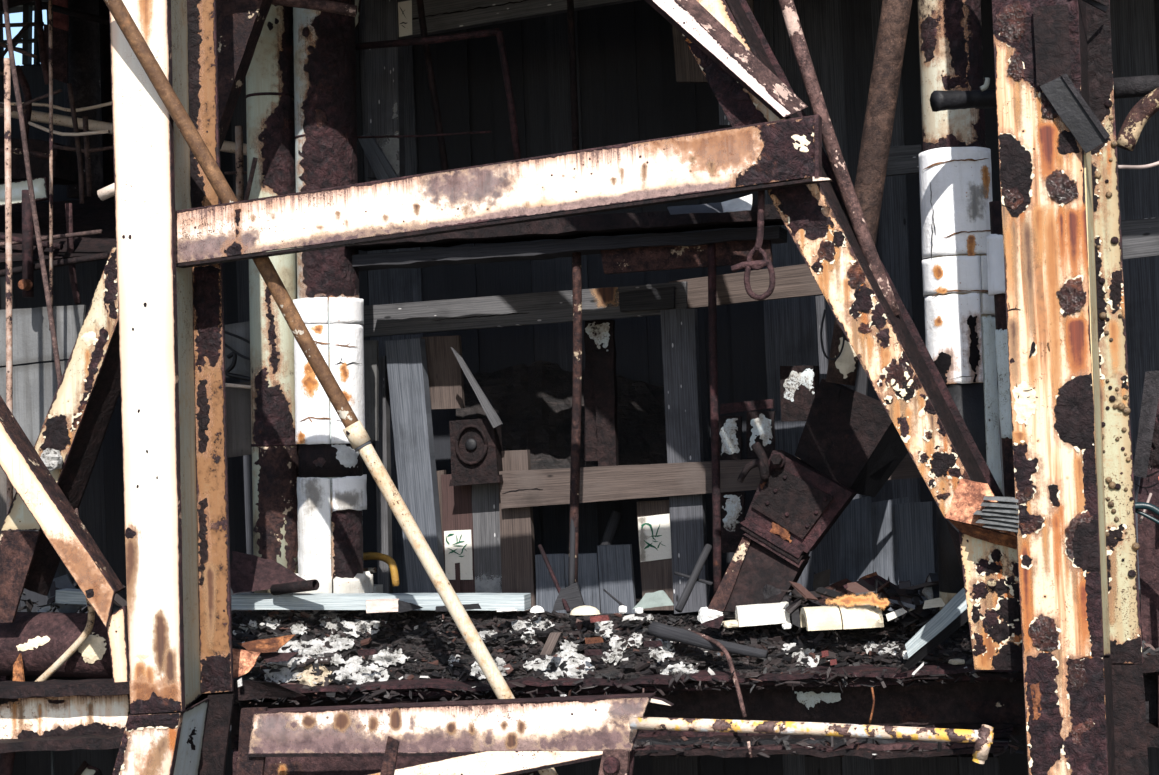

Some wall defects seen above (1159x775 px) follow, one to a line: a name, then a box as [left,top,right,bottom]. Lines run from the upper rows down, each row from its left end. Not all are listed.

corrosion [258,0,358,195]
corrosion [190,149,207,208]
corrosion [279,162,514,300]
corrosion [635,34,963,516]
peeling [783,368,815,402]
peeling [835,337,857,379]
peeling [884,371,913,403]
corrosion [919,0,1142,775]
peeling [231,600,495,706]
peeling [466,576,1019,723]
corrosion [250,697,649,775]
peeling [632,735,969,758]